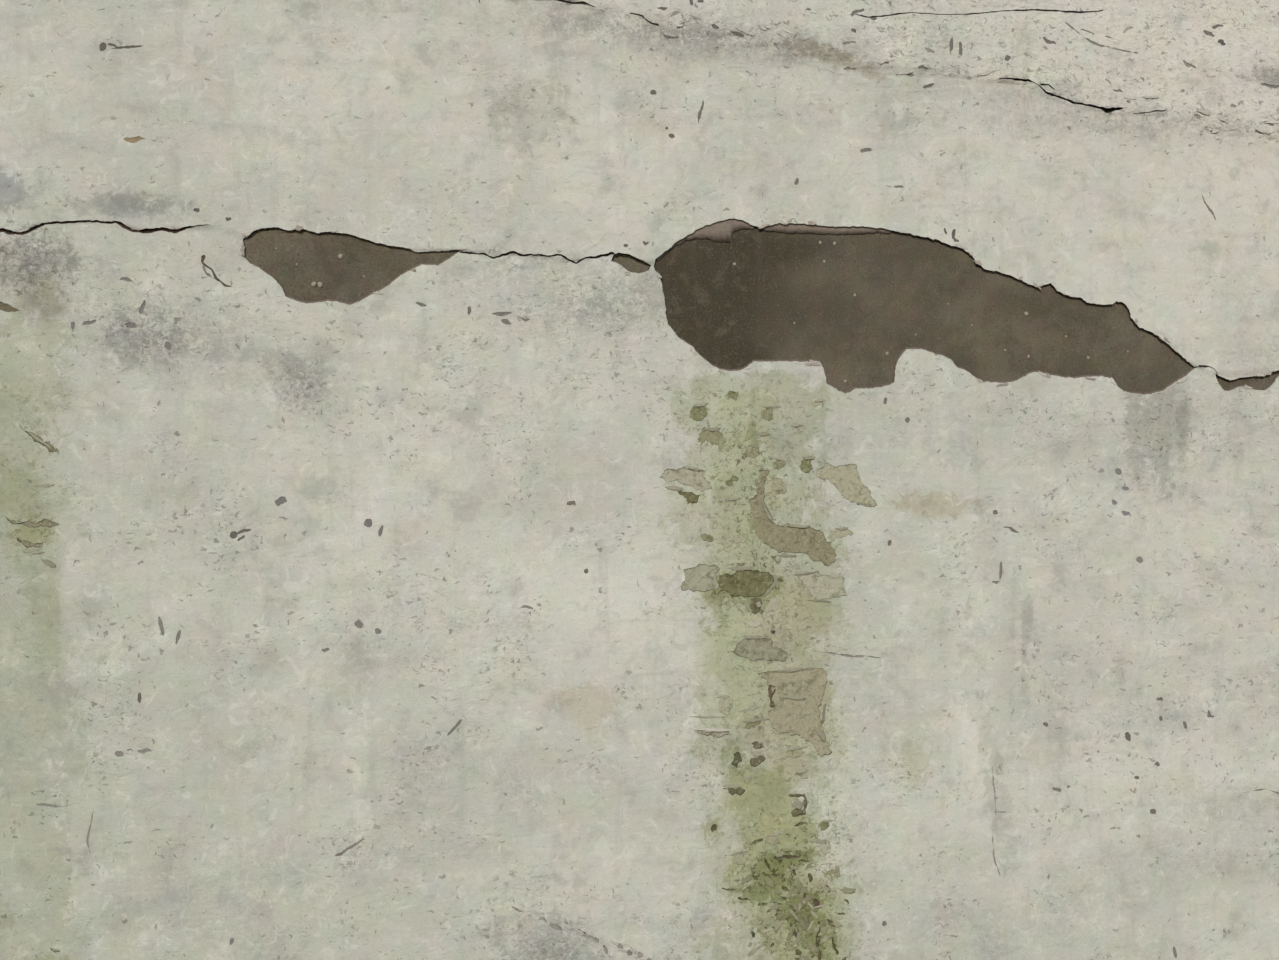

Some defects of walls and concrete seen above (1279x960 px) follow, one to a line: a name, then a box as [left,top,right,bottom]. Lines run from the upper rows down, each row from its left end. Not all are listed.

crack [855,9,1138,54]
crack [999,78,1166,114]
crack [0,220,232,287]
flaking render [240,225,466,306]
crack [458,251,615,264]
flaking render [611,218,1198,405]
water stain [707,376,791,420]
water stain [696,443,794,512]
peeling [660,402,877,602]
peeling [681,564,832,795]
water stain [706,590,849,885]
water stain [457,874,716,960]